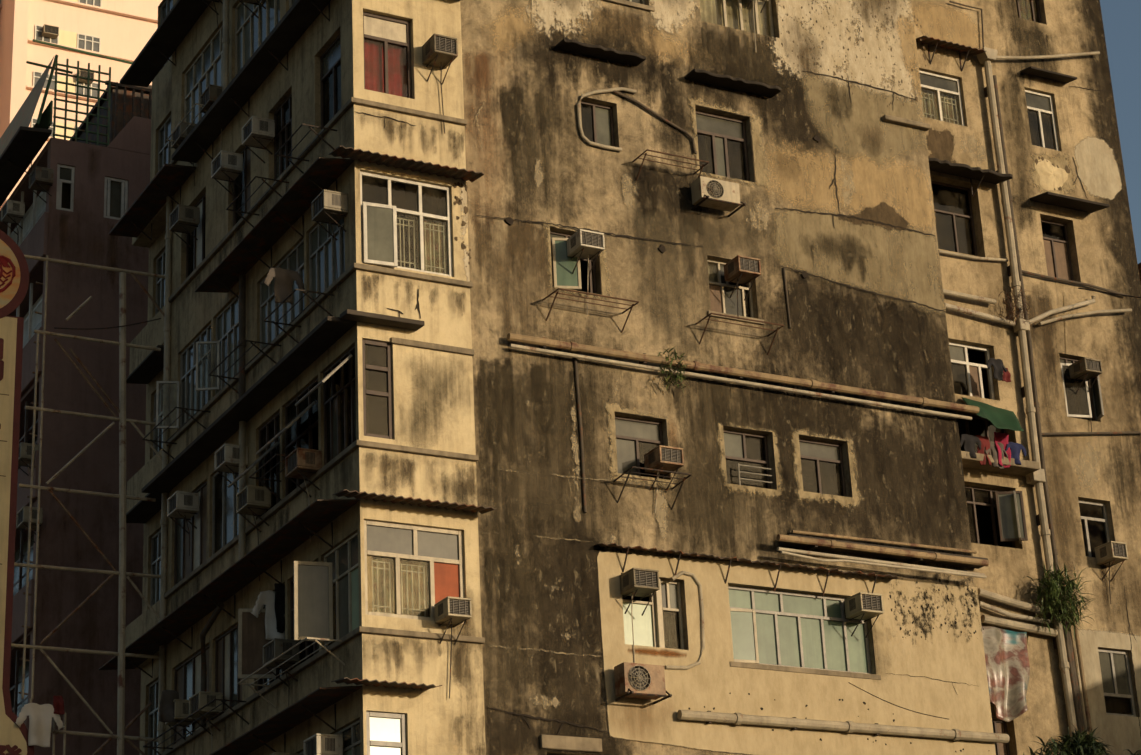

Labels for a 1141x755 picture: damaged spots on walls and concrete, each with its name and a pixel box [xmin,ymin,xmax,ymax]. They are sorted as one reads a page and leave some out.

flaking render [493,0,725,64]
peeling [769,0,980,107]
crack [775,149,935,236]
damp [444,10,833,755]
damp [667,236,984,640]
corrosion [631,649,681,657]